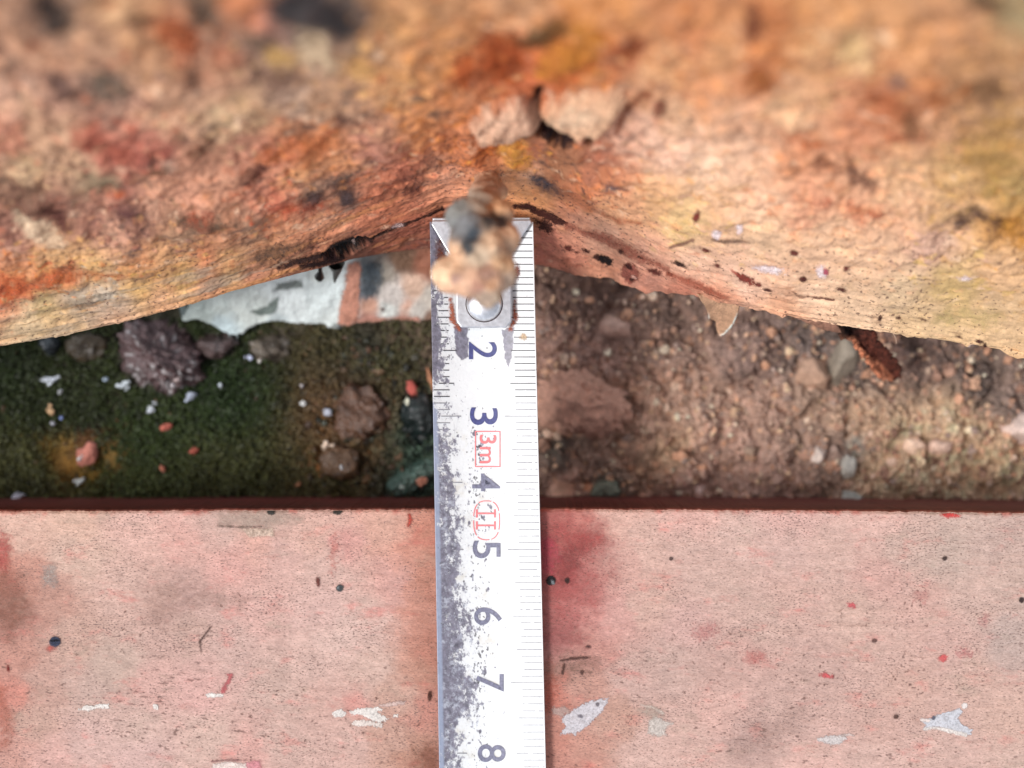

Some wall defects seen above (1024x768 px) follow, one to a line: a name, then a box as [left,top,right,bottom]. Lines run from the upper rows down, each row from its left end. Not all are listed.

crack [277,206,444,270]
corrosion [449,298,461,331]
corrosion [509,300,526,340]
corrosion [838,325,902,382]